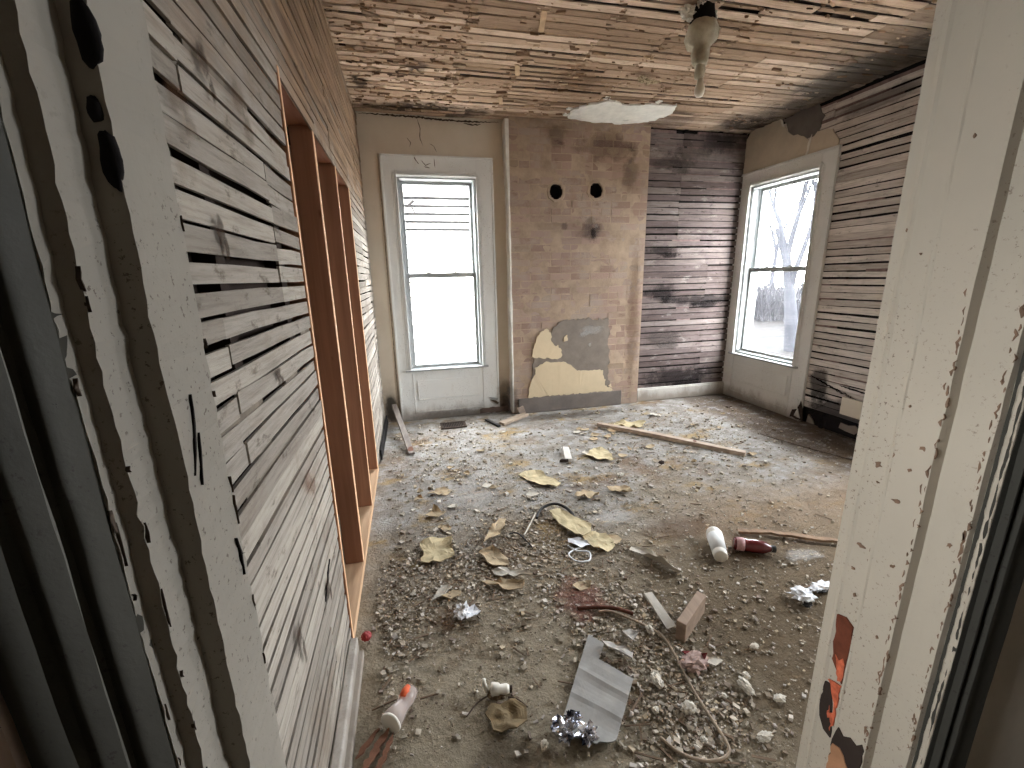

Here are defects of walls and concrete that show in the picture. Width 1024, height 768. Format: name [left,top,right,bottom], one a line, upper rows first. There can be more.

crack [359,113,499,168]
peeling [75,266,92,312]
flaking render [528,329,612,398]
peeling [228,476,240,524]
peeling [107,510,128,566]
peeling [161,589,172,627]
peeling [819,439,940,768]